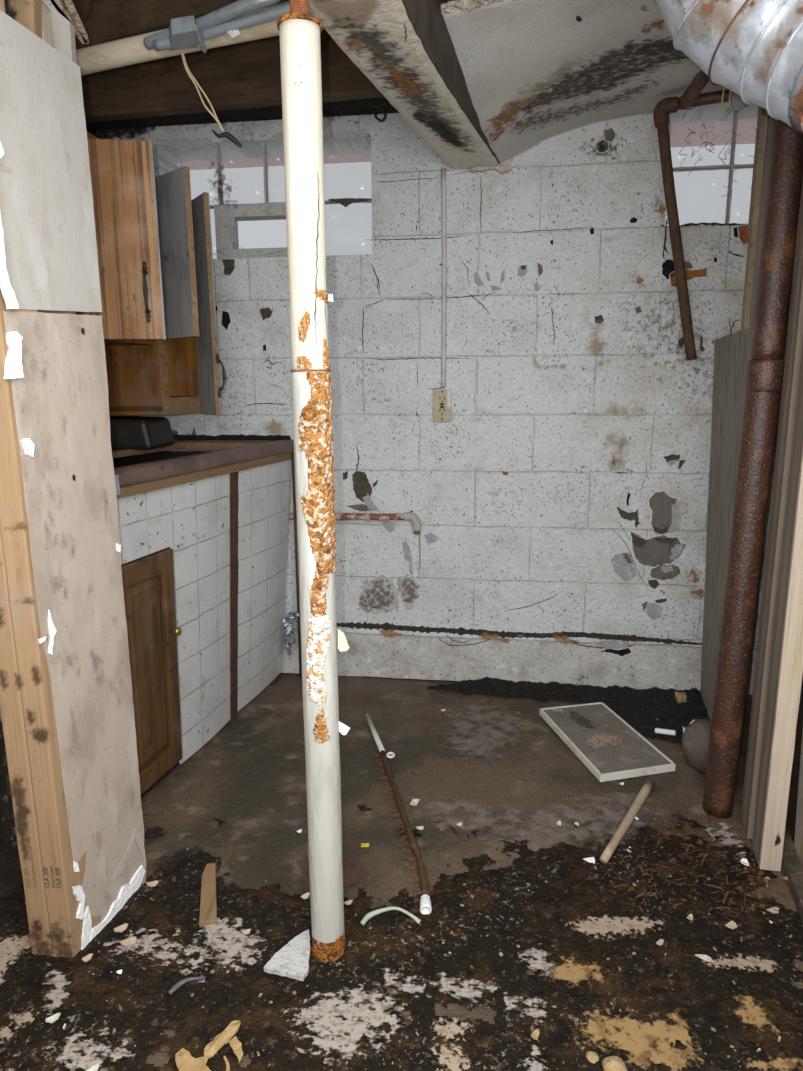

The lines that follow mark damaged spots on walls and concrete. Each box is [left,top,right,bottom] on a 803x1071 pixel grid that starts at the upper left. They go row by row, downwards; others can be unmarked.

water stain [315,0,473,152]
water stain [505,37,689,133]
spalling [595,128,615,153]
spalling [215,306,231,330]
rust [302,405,316,421]
peeling [343,470,397,533]
peeling [358,540,420,614]
water stain [359,579,419,612]
peeling [610,490,687,620]